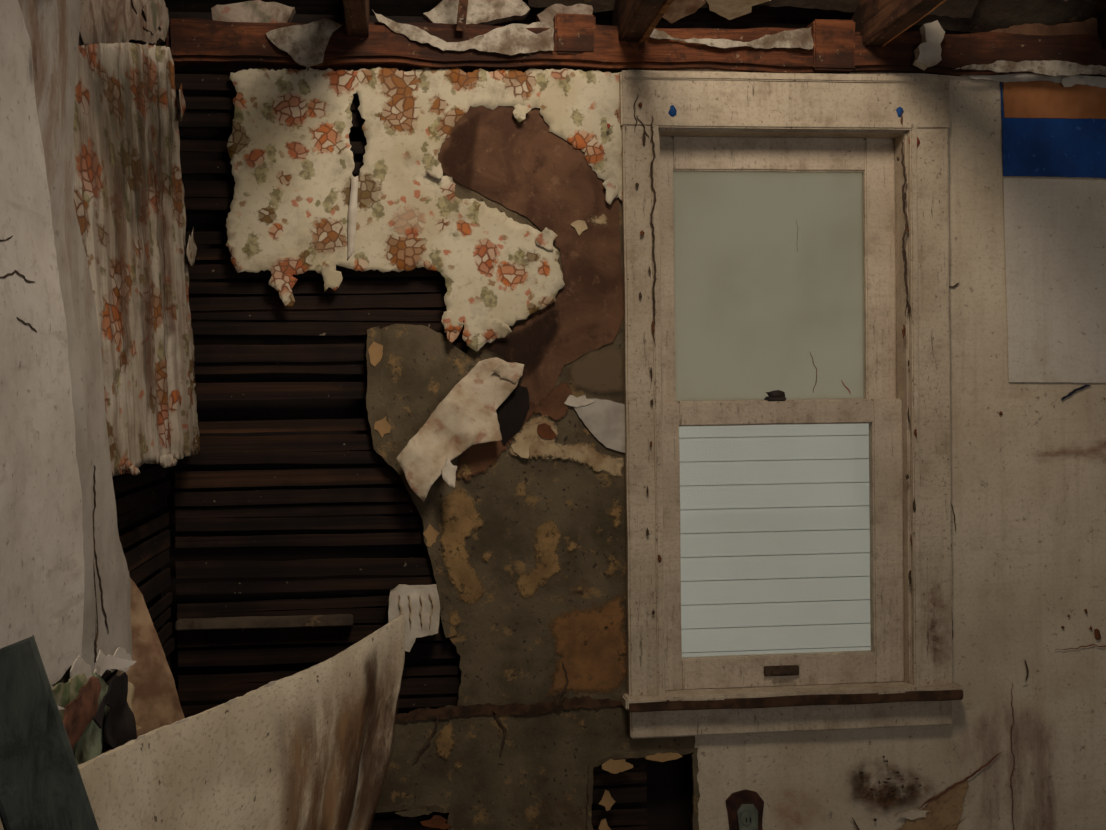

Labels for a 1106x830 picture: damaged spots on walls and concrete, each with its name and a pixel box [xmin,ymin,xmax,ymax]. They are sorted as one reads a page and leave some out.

peeling [635,116,656,342]
flaking render [366,104,625,638]
crack [93,465,109,663]
flaking render [549,597,627,694]
water stain [285,659,392,830]
flaking render [374,803,454,830]
flaking render [436,722,461,768]
flaking render [586,748,700,830]
mould [853,755,927,822]
spalling [896,752,1001,830]